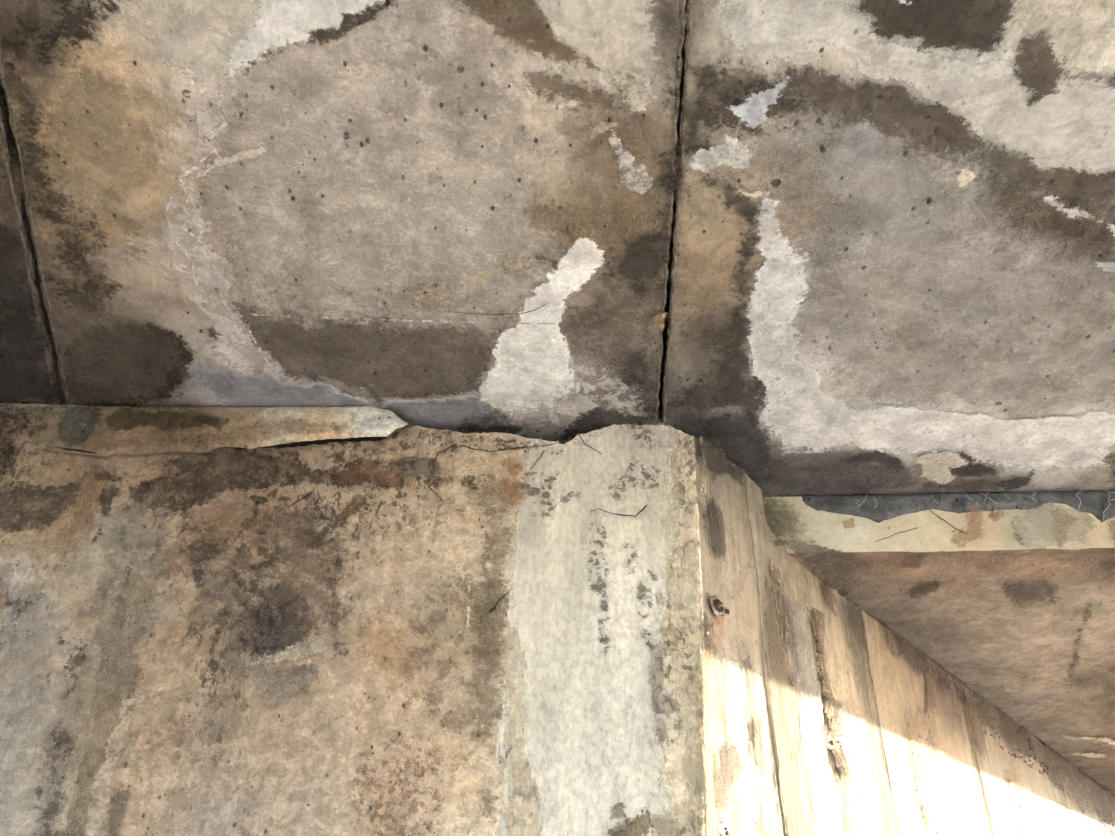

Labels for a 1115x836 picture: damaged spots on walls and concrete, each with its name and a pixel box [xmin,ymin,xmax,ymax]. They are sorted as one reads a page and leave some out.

spalling [0,35,411,457]
water stain [0,0,840,836]
water stain [750,458,999,494]
water stain [823,580,873,700]
water stain [910,581,941,599]
water stain [1002,581,1060,607]
water stain [1068,604,1115,720]
water stain [886,626,1115,836]